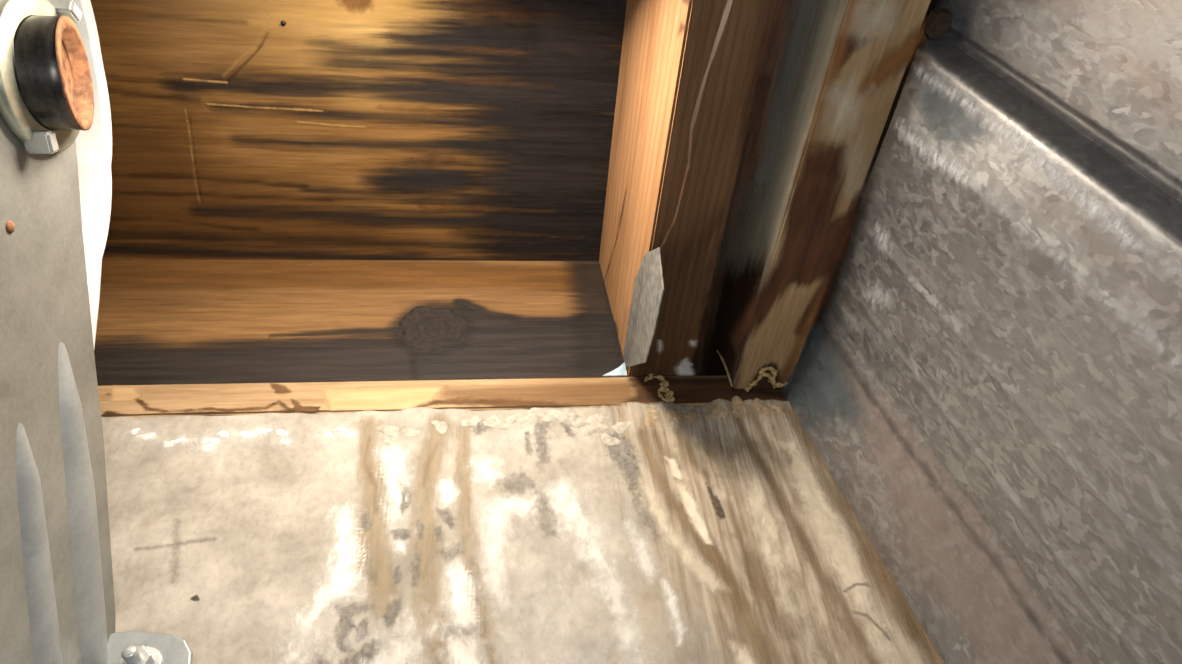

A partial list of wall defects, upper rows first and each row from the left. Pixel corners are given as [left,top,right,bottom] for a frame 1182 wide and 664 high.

water stain [94,0,944,664]